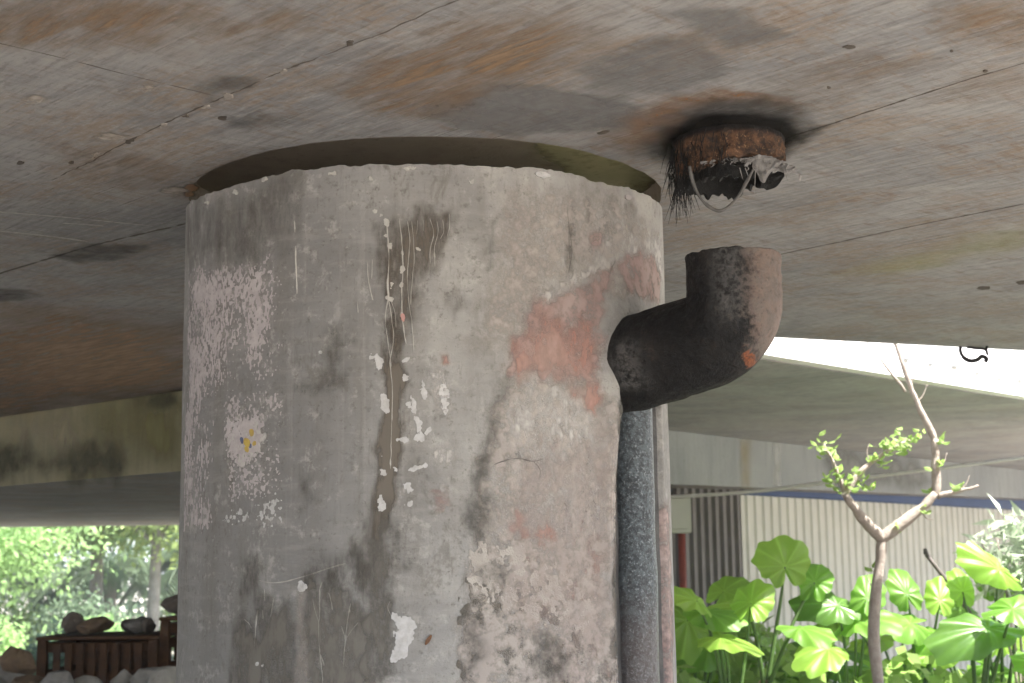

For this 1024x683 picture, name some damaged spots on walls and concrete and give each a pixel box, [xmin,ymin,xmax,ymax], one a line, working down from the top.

peeling [369,353,384,370]
peeling [184,254,283,534]
peeling [380,394,390,414]
peeling [396,380,449,443]
leakage [230,209,450,683]
peeling [380,463,428,507]
flaking render [456,382,618,683]